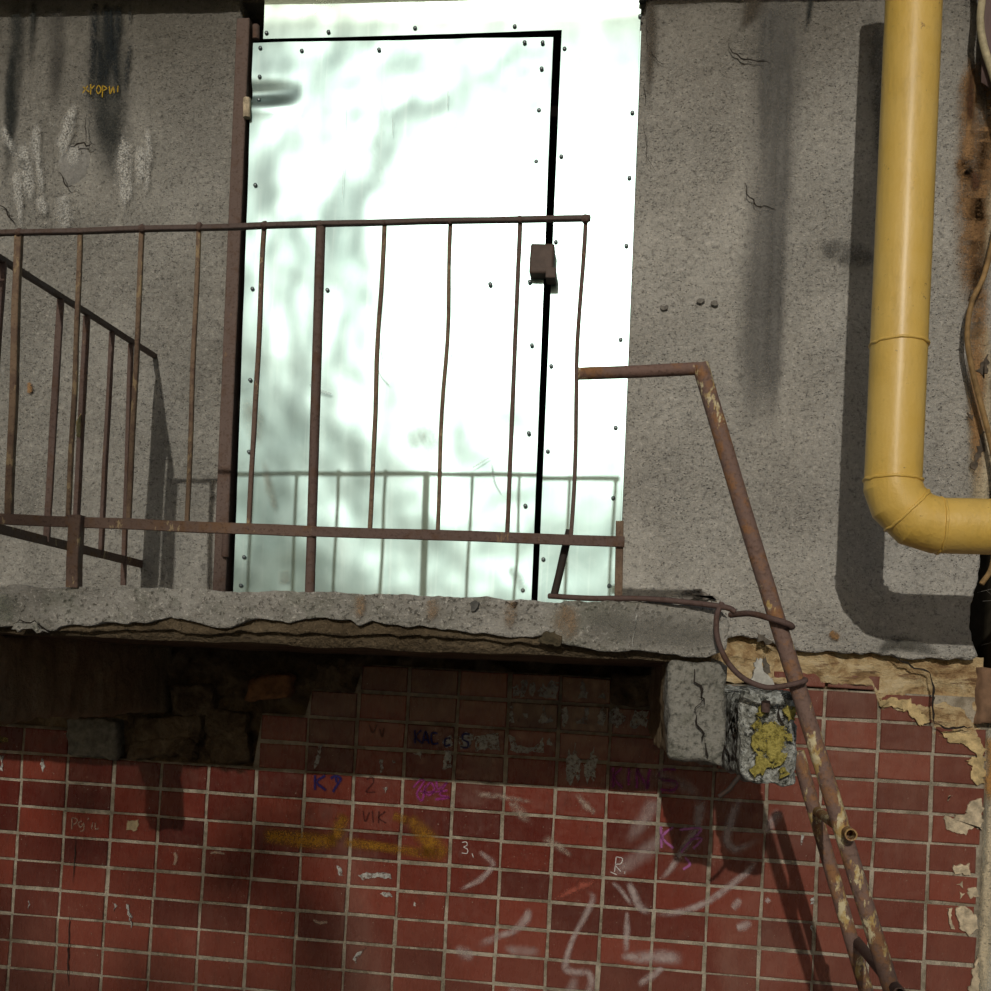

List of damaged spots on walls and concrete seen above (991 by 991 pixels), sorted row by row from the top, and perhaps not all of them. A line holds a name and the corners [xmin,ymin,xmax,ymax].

leakage [2,2,47,216]
leakage [58,110,78,163]
crack [71,115,95,150]
leakage [90,3,152,204]
crack [745,183,776,210]
rust [957,67,991,465]
spalling [12,617,564,648]
crack [693,669,709,757]
crack [891,654,973,730]
peeling [941,730,986,786]
peeling [943,798,985,835]
peeling [947,863,979,936]